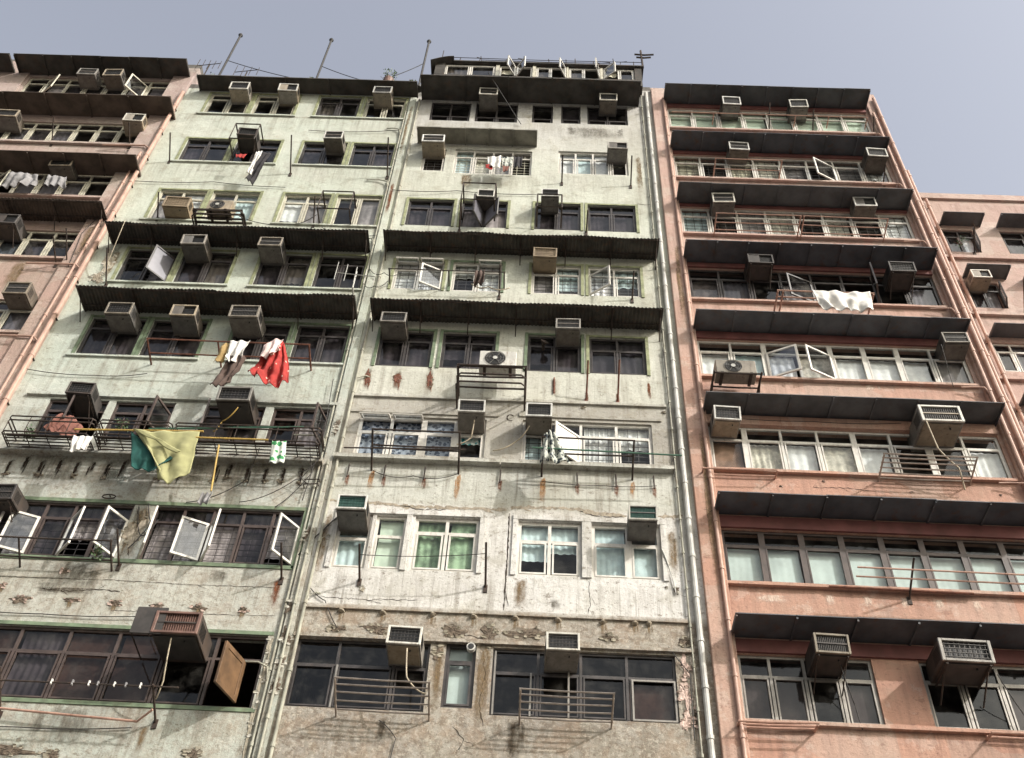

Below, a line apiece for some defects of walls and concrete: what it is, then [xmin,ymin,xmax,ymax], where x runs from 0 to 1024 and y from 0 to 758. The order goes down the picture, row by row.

spalling [430,623,548,662]
peeling [676,635,701,731]